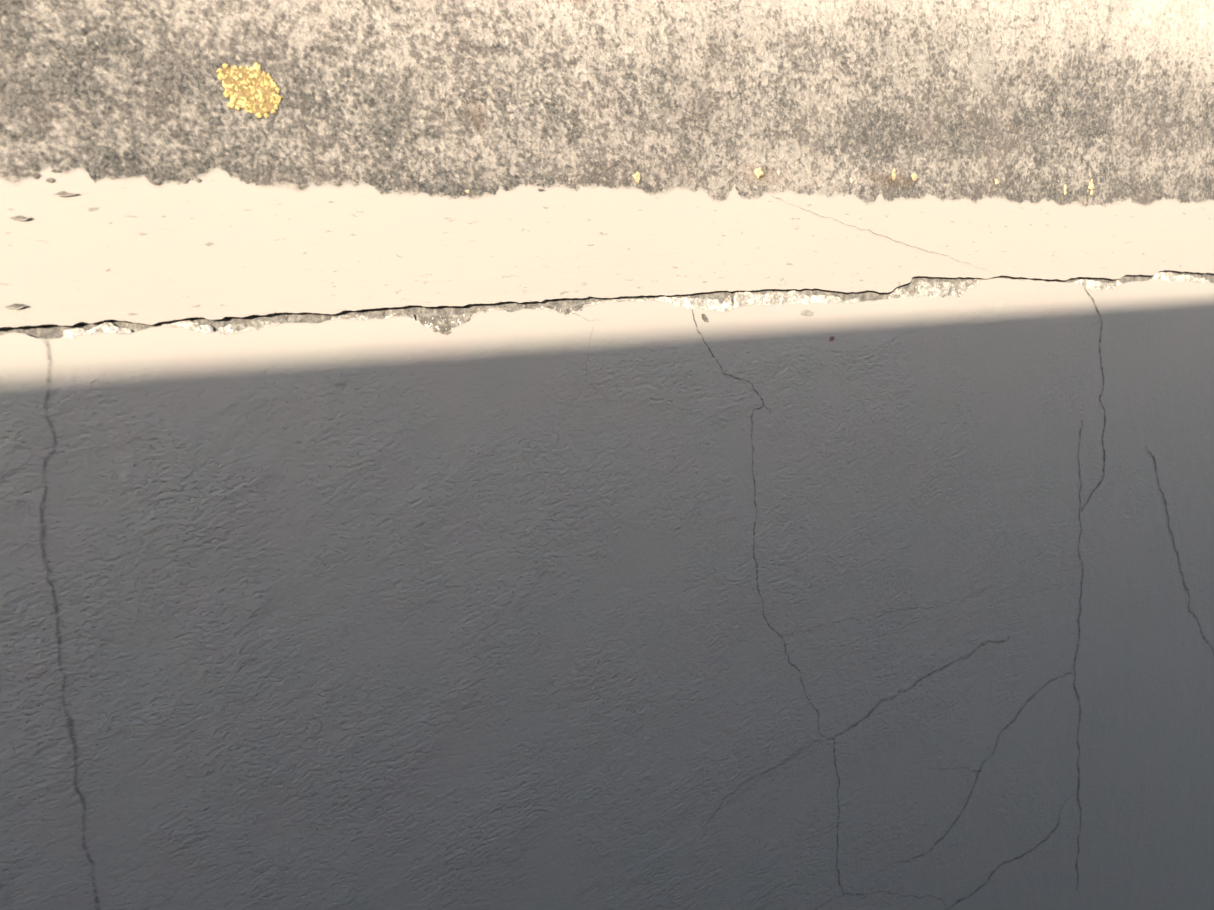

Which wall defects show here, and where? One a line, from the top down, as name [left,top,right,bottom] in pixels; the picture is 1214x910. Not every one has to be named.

peeling [31,169,77,197]
damp [662,0,1214,205]
crack [0,233,1214,902]